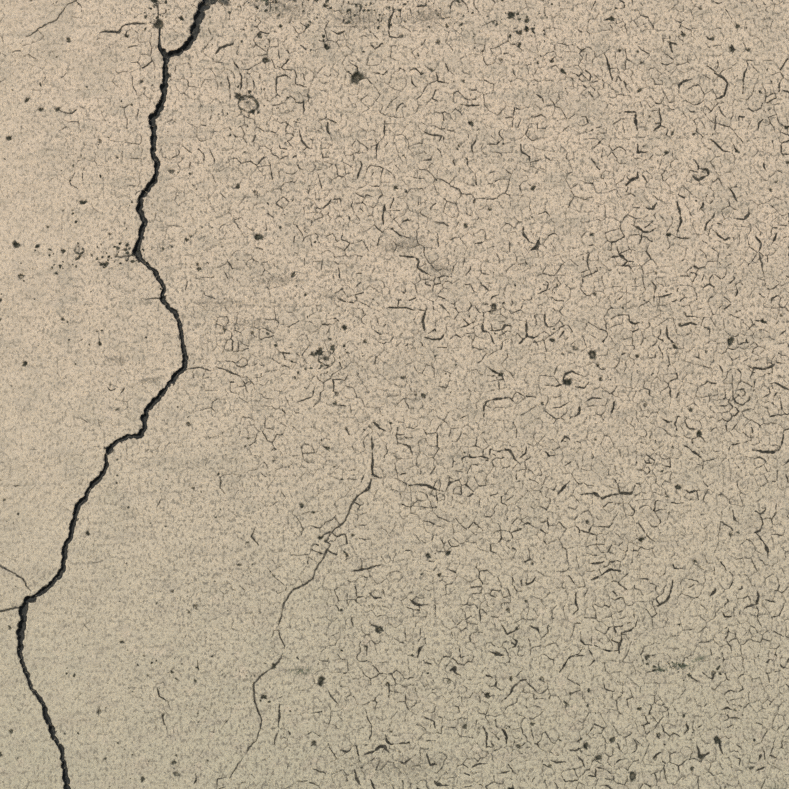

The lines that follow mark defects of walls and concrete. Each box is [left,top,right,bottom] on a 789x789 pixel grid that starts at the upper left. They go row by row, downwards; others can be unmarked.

crack [0,0,99,59]
crack [575,0,654,36]
crack [475,37,551,82]
crack [185,247,282,296]
crack [251,311,368,414]
crack [243,416,296,451]
crack [251,439,330,477]
crack [272,697,291,748]
crack [465,760,516,789]